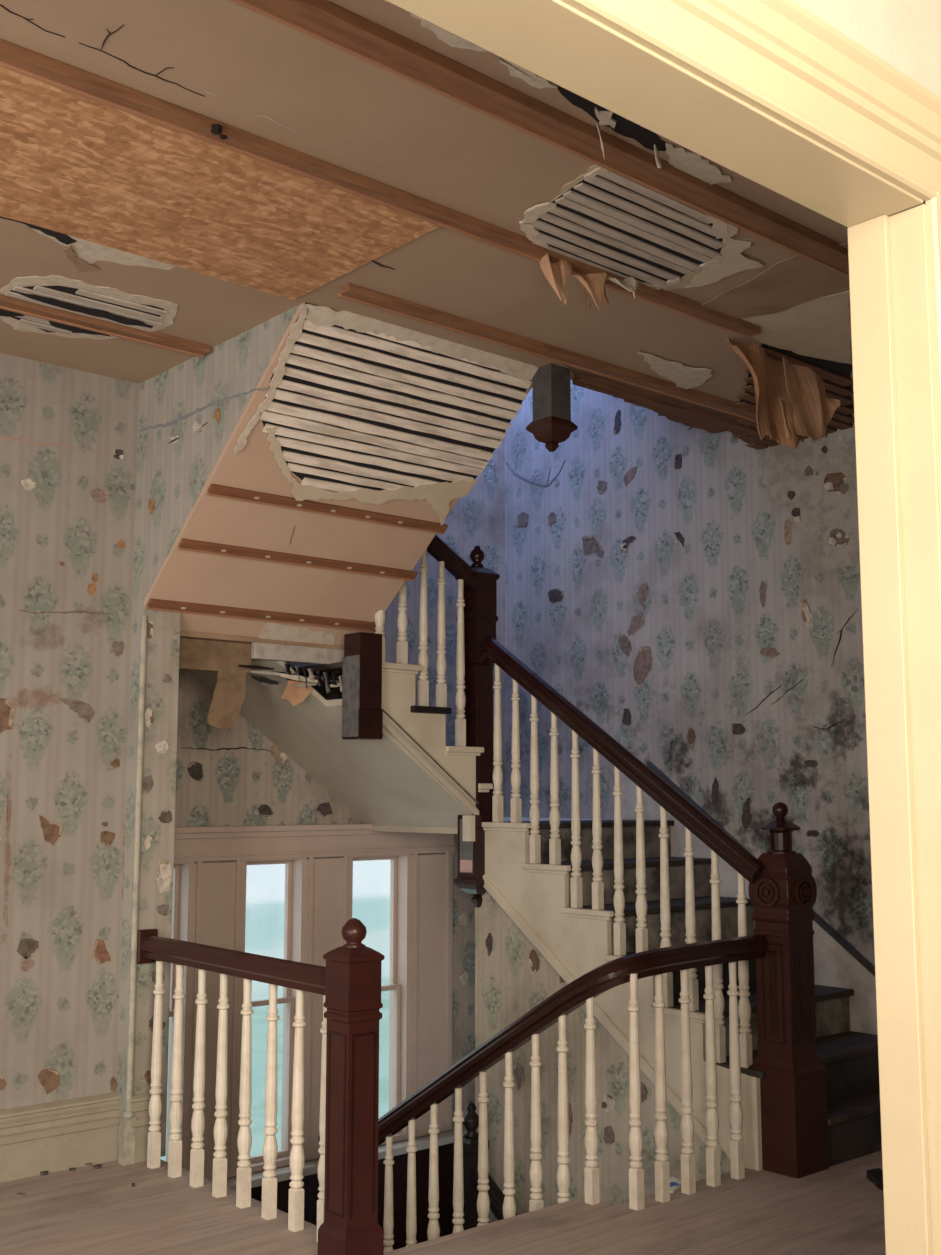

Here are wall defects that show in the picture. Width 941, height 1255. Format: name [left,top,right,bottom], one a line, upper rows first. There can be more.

crack [0,4,217,97]
spalling [11,285,164,327]
flaking render [32,228,176,270]
peeling [410,13,860,574]
spalling [260,302,526,490]
leakage [781,755,815,787]
leakage [828,699,855,755]
leakage [822,832,867,936]